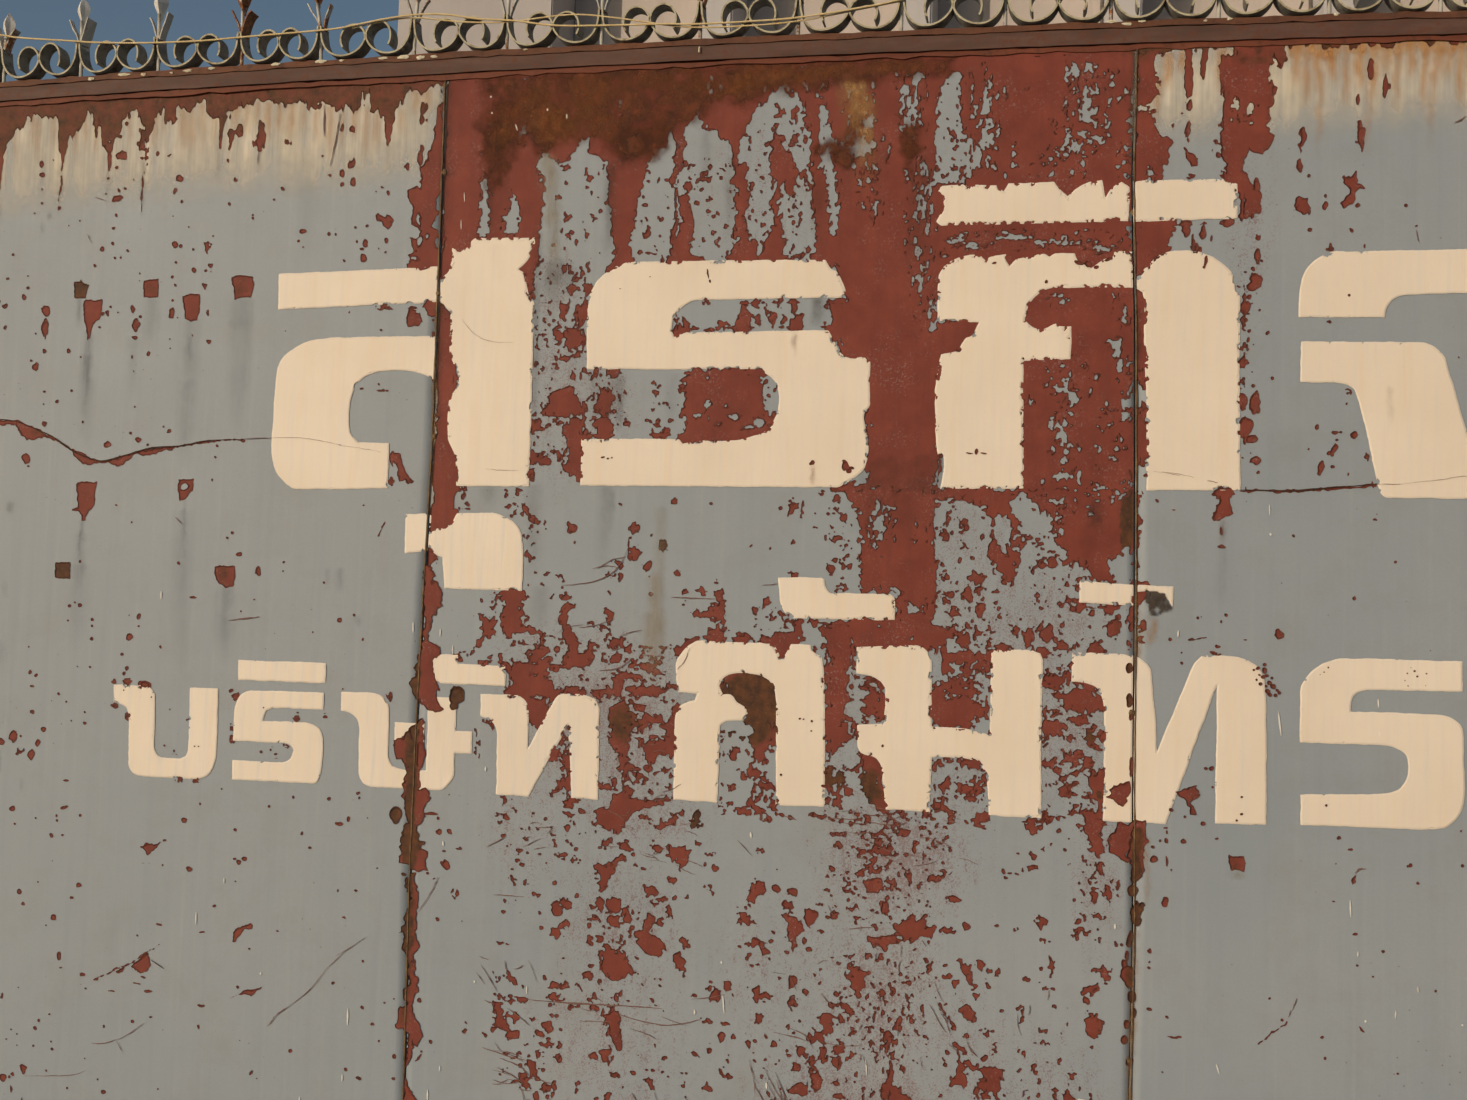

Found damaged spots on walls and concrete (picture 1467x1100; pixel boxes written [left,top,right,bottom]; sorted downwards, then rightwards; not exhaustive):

rust [483,57,952,183]
peeling [1294,171,1365,232]
peeling [67,226,214,372]
peeling [231,275,254,300]
peeling [671,296,804,338]
peeling [1233,234,1270,474]
crack [0,419,379,467]
peeling [375,299,470,532]
peeling [72,481,97,521]
peeling [1212,486,1247,548]
peeling [214,531,242,588]
peeling [110,613,152,721]